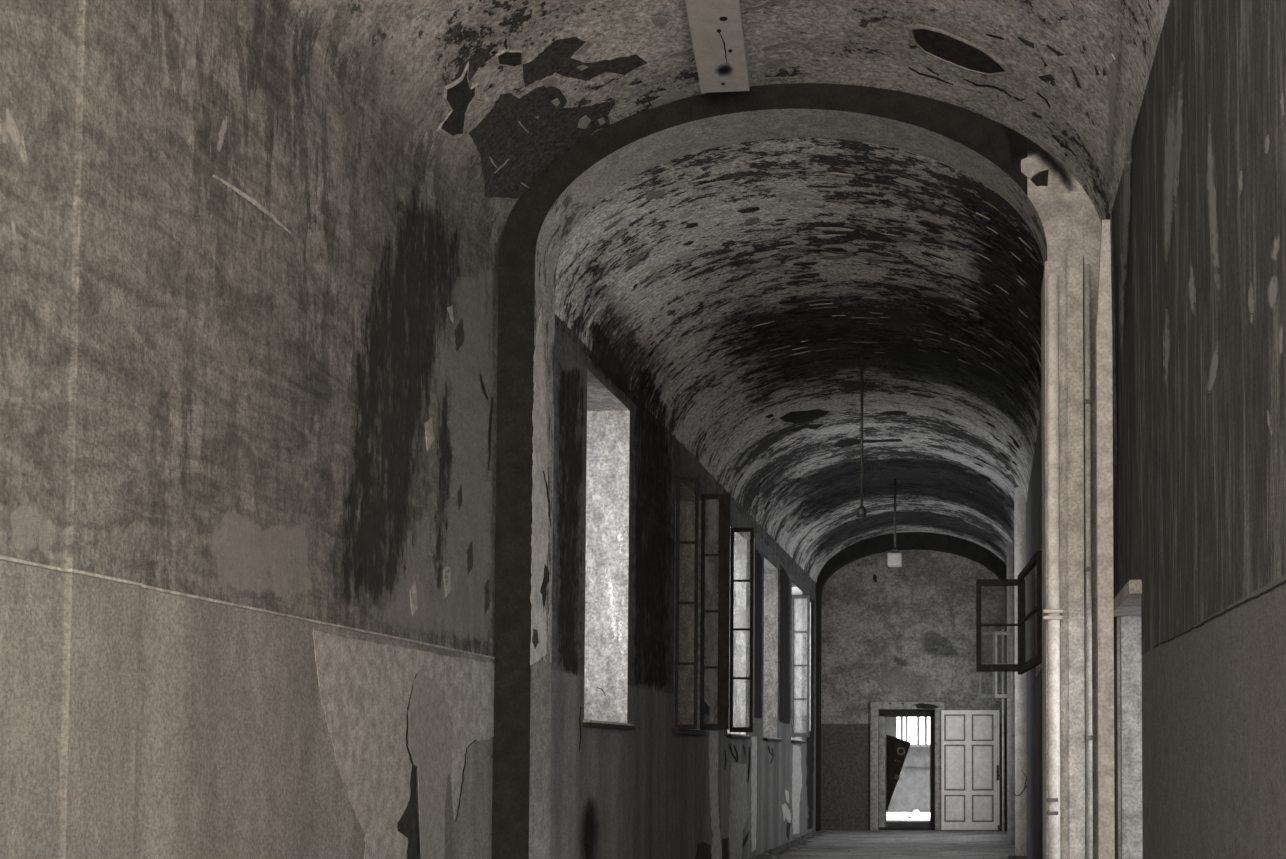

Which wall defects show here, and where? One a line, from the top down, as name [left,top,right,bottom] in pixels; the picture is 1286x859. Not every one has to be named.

peeling [437,37,693,199]
damp [333,192,460,603]
peeling [313,630,494,859]